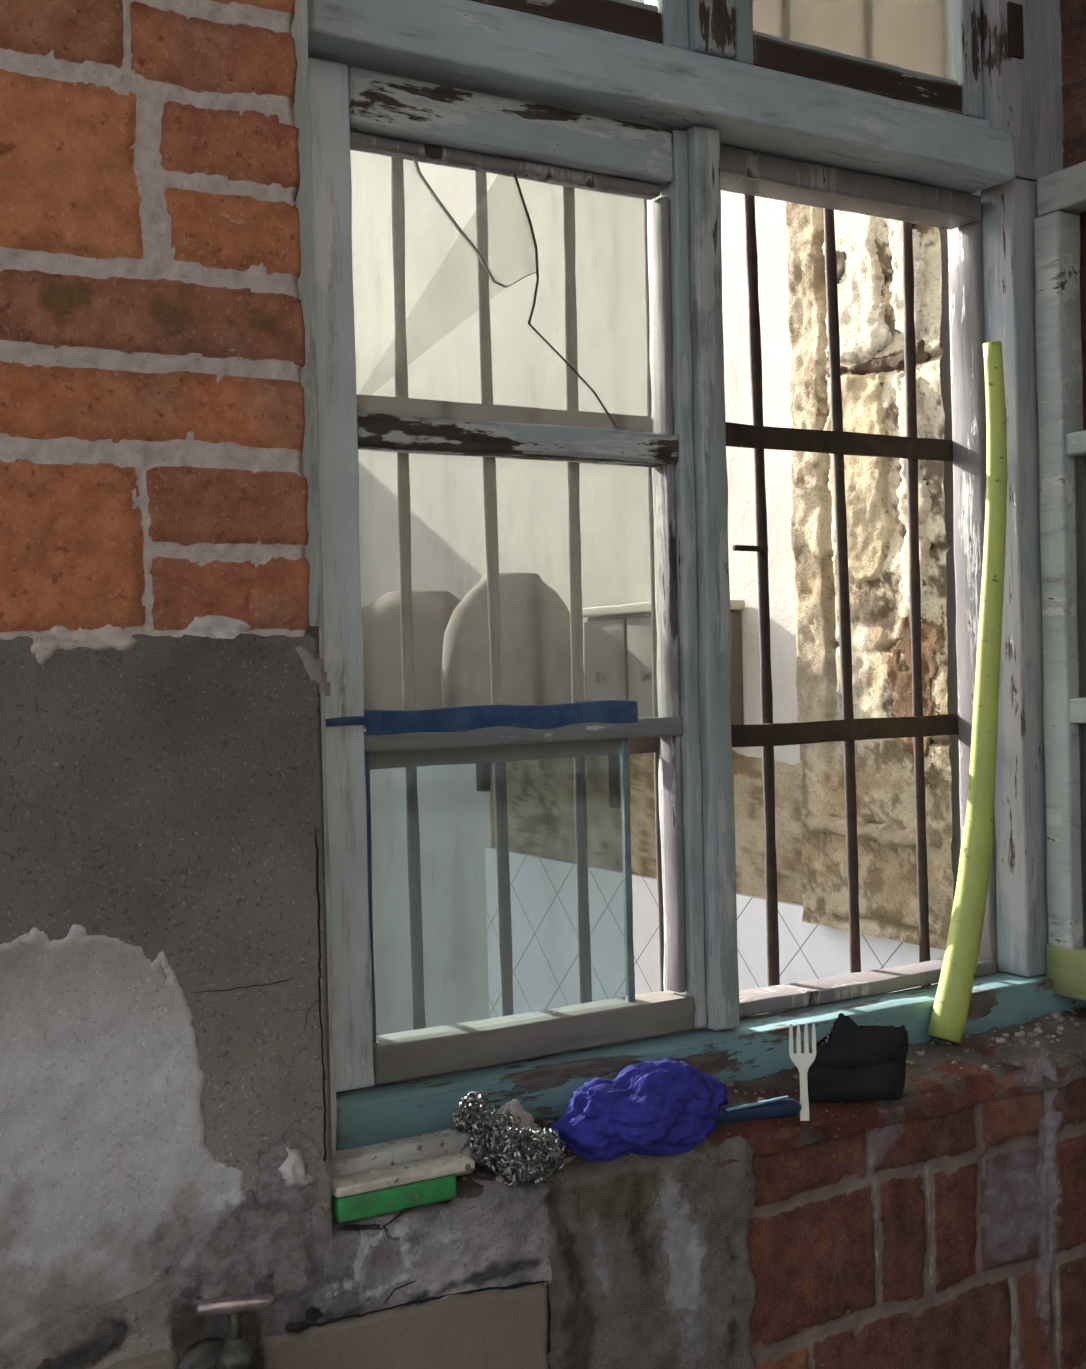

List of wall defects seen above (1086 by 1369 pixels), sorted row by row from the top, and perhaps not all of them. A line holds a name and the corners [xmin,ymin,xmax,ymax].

corrosion [884,612,945,717]
corrosion [891,736,938,789]
peeling [0,924,246,1368]
peeling [278,1147,314,1188]
water stain [989,1053,1061,1353]
water stain [27,1306,137,1369]
water stain [169,1275,265,1369]
water stain [327,1217,463,1303]
water stain [545,1186,610,1369]
water stain [629,1177,708,1354]
water stain [1008,1276,1019,1369]